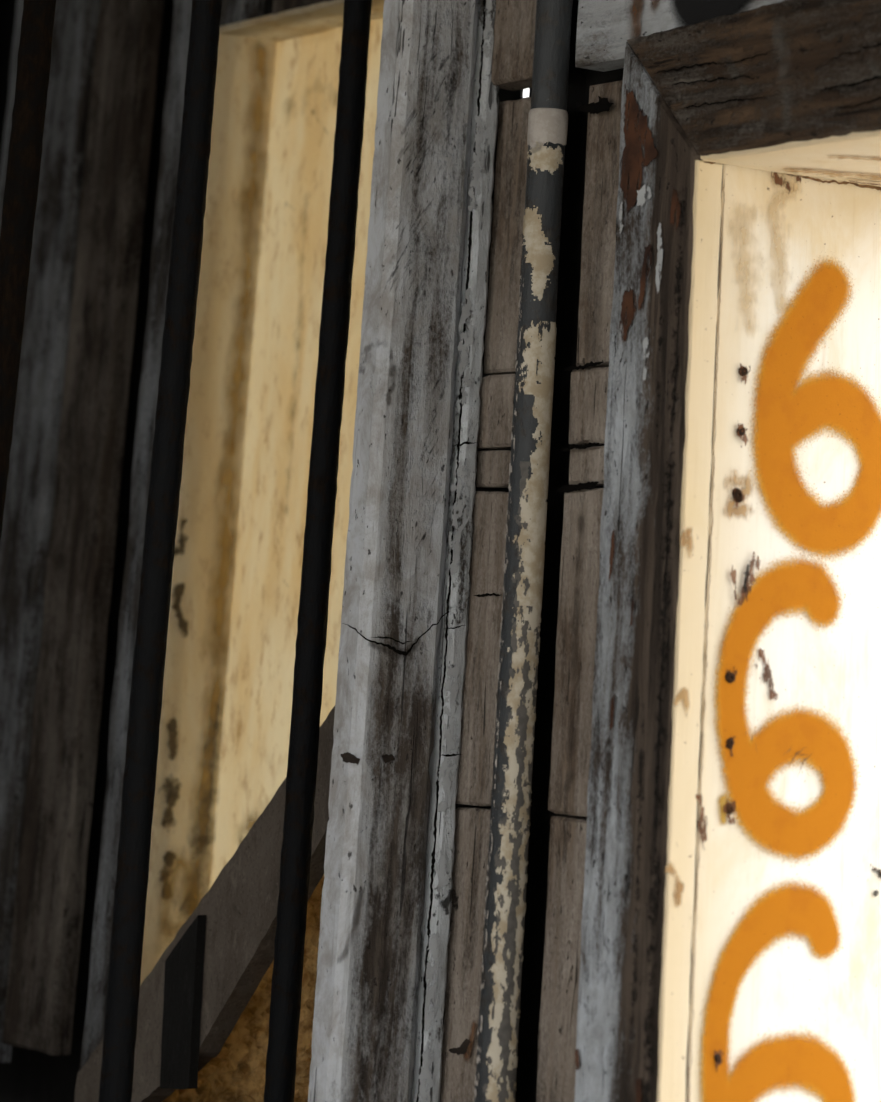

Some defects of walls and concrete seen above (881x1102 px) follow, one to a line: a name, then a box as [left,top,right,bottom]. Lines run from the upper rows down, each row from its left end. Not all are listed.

crack [463,0,486,344]
peeling [527,141,563,174]
crack [342,371,500,1102]
peeling [474,205,557,1102]